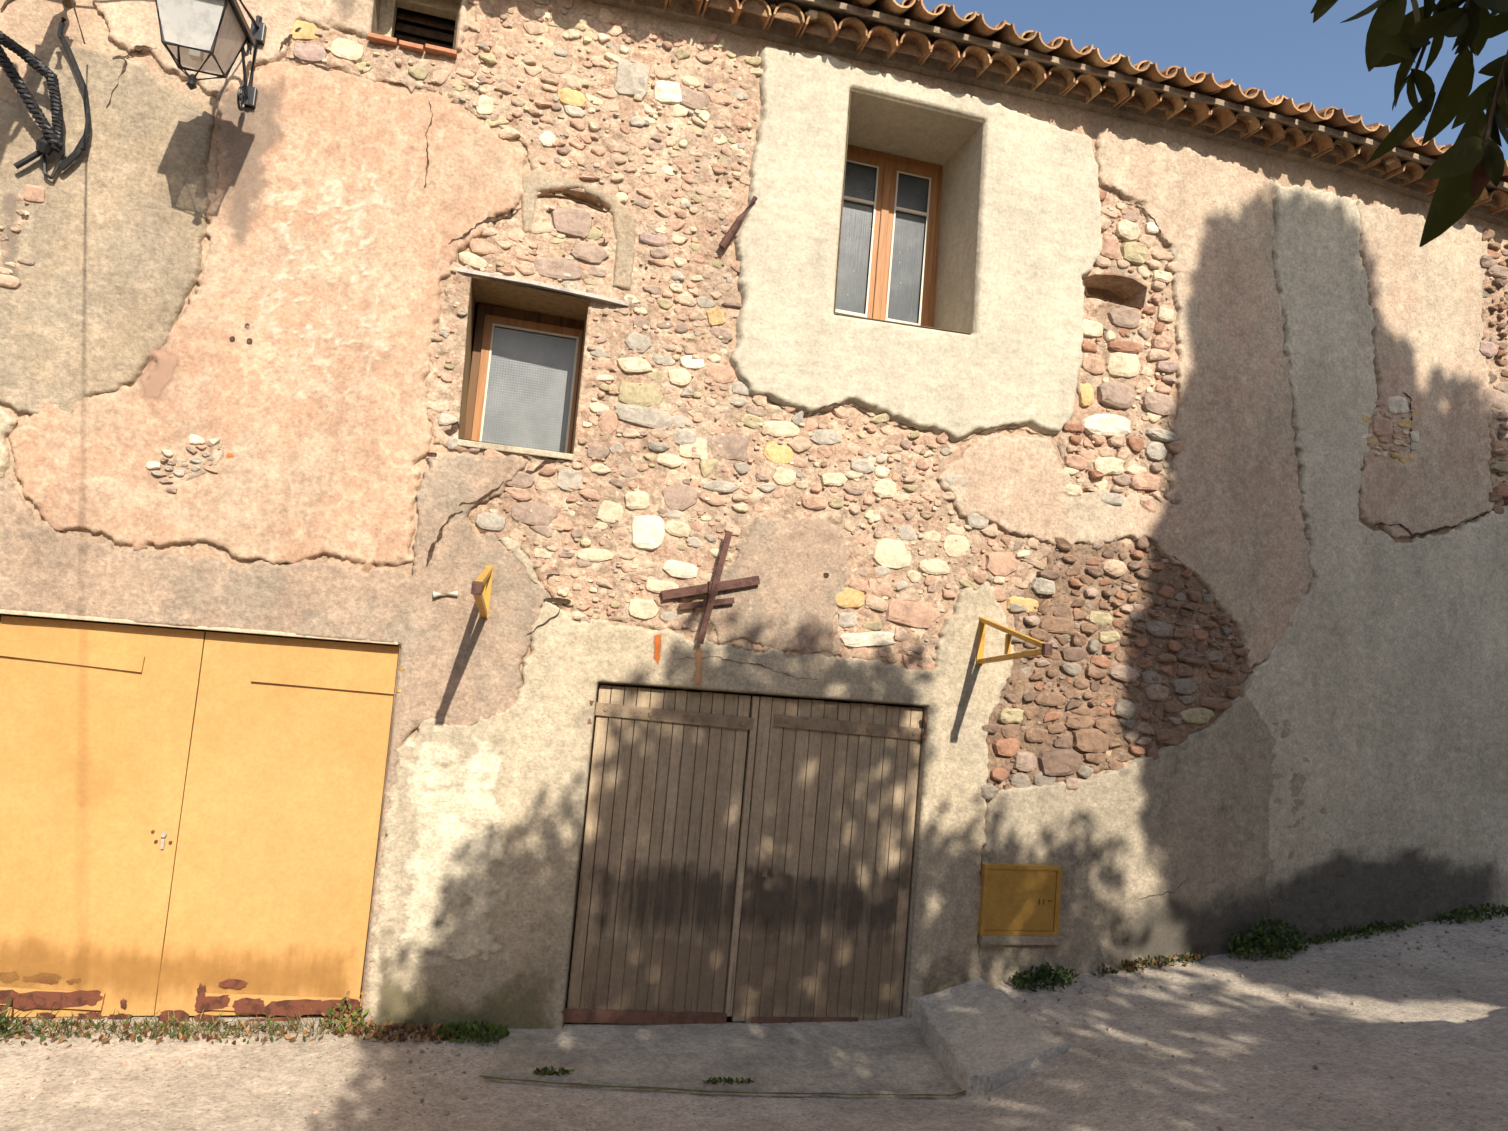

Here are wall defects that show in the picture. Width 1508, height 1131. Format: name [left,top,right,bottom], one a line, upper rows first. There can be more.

crack [424,102,433,187]
spalling [0,184,45,290]
spalling [145,433,225,493]
spalling [285,0,1254,799]
spalling [1362,394,1421,464]
spalling [1479,228,1508,514]
crack [426,458,570,566]
rust [0,973,133,1020]
rust [158,979,360,1022]